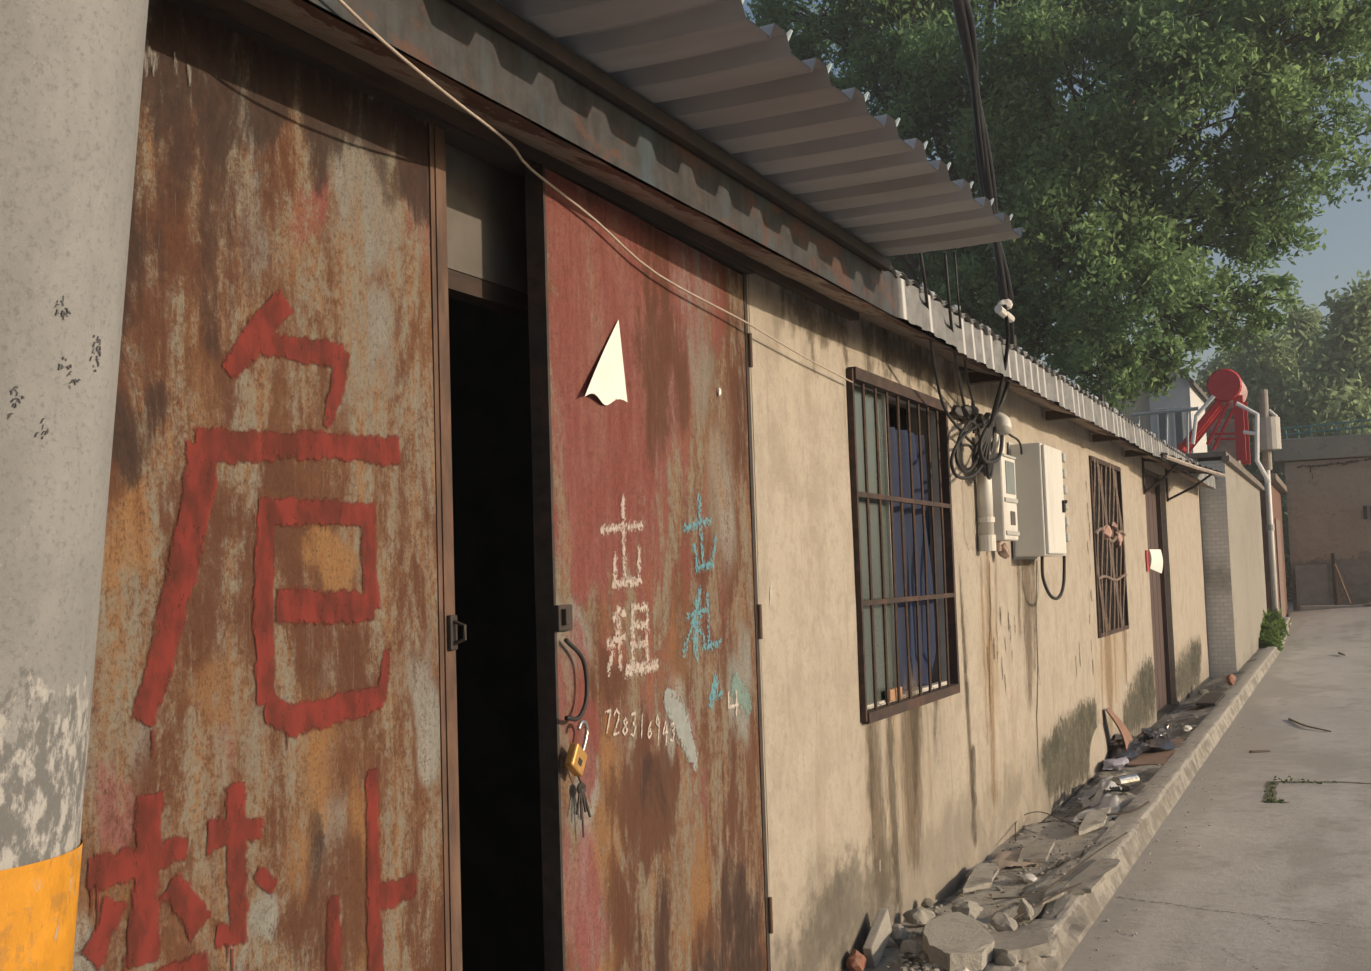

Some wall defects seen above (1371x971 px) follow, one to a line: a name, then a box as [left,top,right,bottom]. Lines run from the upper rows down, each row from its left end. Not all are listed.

water stain [1123,658,1156,735]
water stain [1175,637,1205,711]
water stain [1042,698,1099,801]
water stain [787,677,937,971]